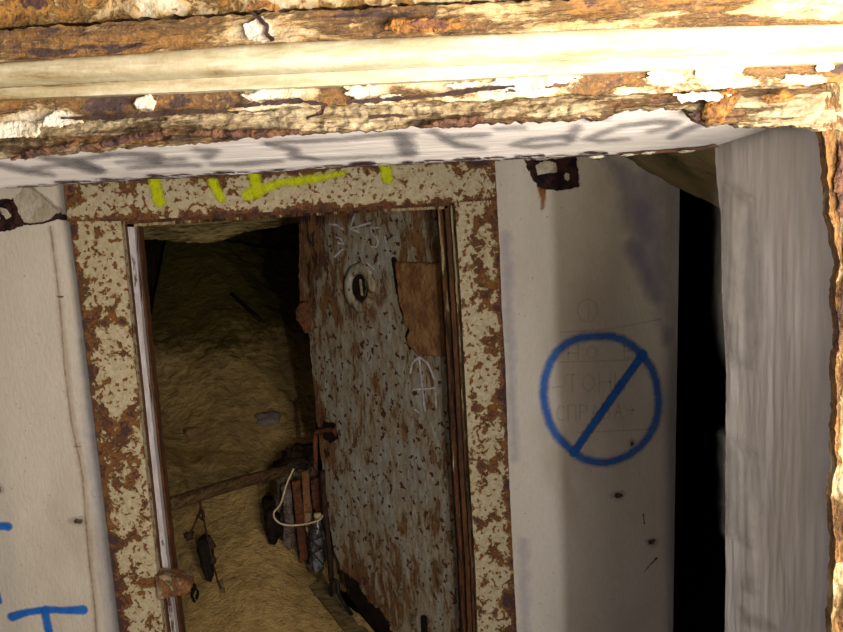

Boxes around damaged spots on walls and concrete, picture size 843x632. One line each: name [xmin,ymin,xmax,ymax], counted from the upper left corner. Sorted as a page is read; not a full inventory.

corrosion [383,17,466,34]
peeling [445,75,583,92]
peeling [646,71,673,83]
peeling [781,64,835,86]
peeling [133,94,156,111]
peeling [241,89,297,102]
peeling [343,85,404,103]
peeling [673,91,732,103]
peeling [0,110,84,139]
corrosion [834,139,843,218]